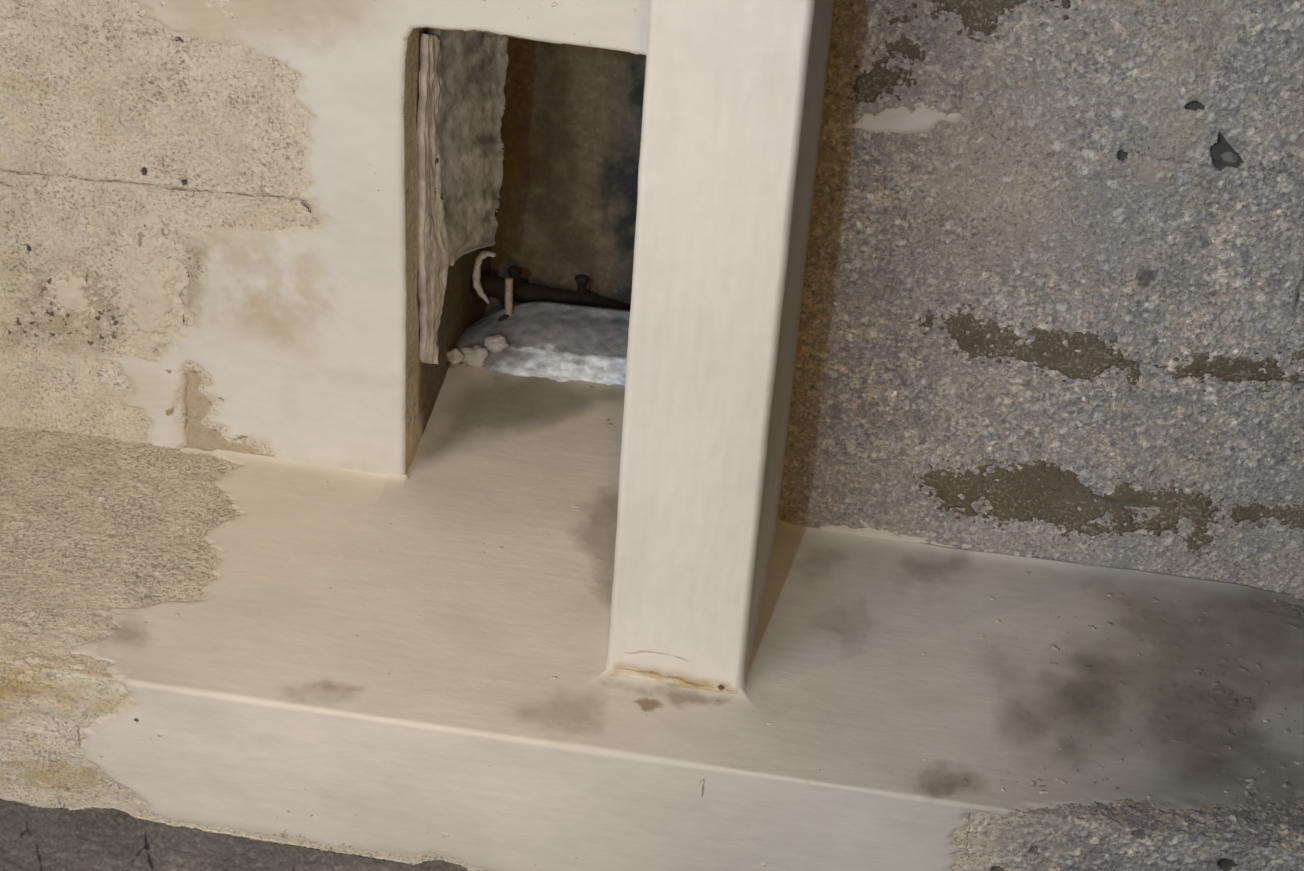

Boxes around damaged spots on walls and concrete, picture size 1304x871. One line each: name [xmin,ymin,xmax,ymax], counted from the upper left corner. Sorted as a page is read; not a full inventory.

spalling [846,0,1078,108]
crack [81,178,311,213]
spalling [909,303,1304,395]
peeling [166,371,250,453]
spalling [911,458,1304,557]
damp [1062,608,1286,776]